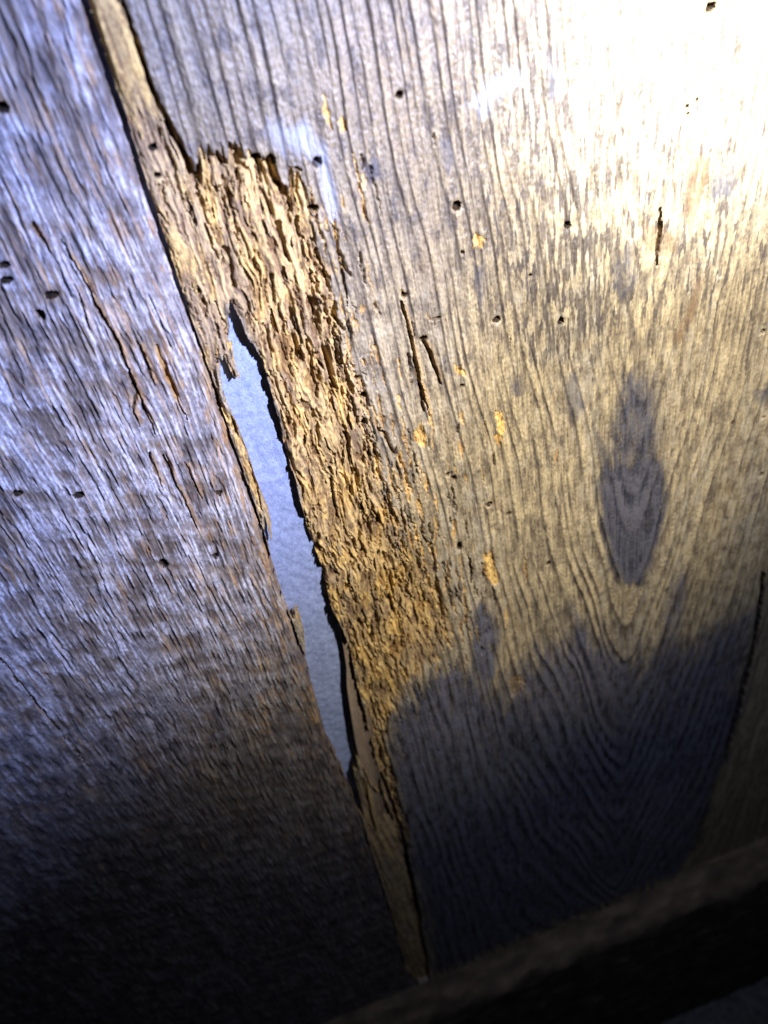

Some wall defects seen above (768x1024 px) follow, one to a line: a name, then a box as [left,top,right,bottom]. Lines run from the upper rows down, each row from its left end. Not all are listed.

peeling [274,304,307,357]
peeling [325,437,355,484]
peeling [333,395,355,429]
peeling [413,421,429,448]
crack [240,471,263,529]
peeling [336,563,363,622]